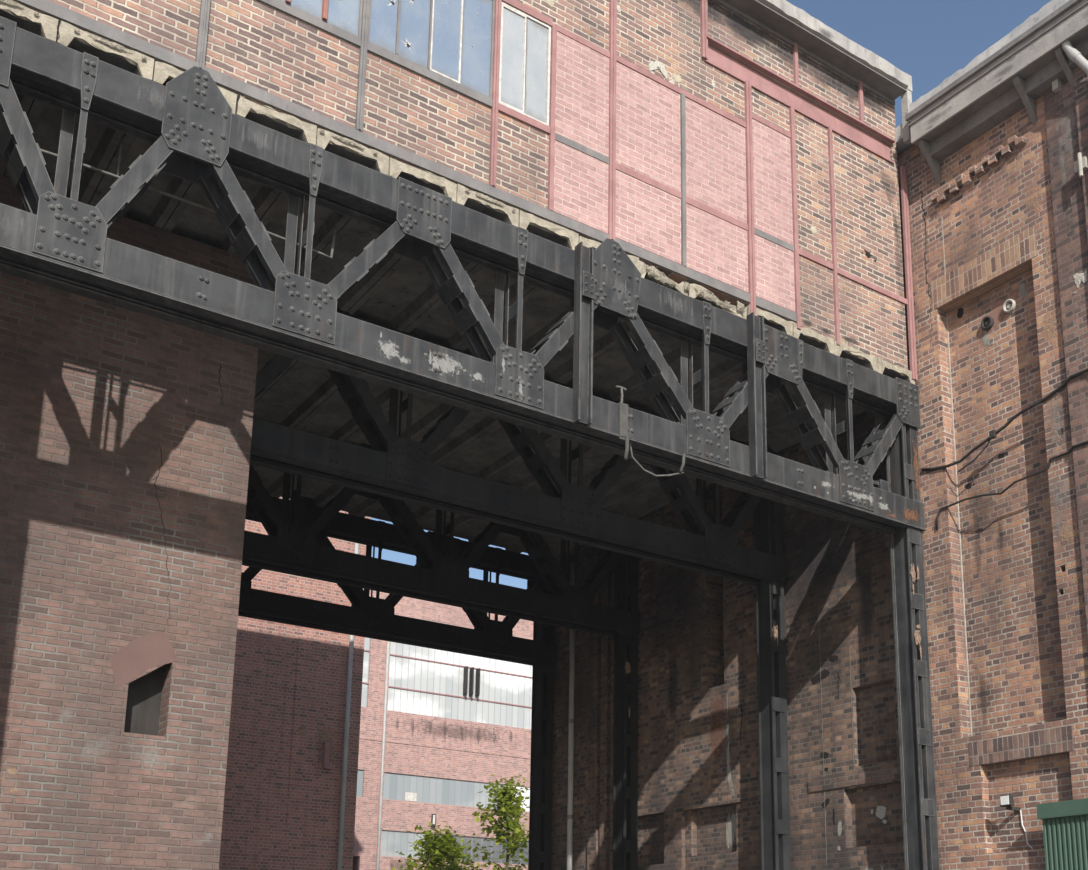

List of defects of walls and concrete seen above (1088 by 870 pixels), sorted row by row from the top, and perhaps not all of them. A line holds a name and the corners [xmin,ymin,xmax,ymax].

spalling [647,265,745,313]
crack [144,445,173,623]
flaking render [871,805,887,824]